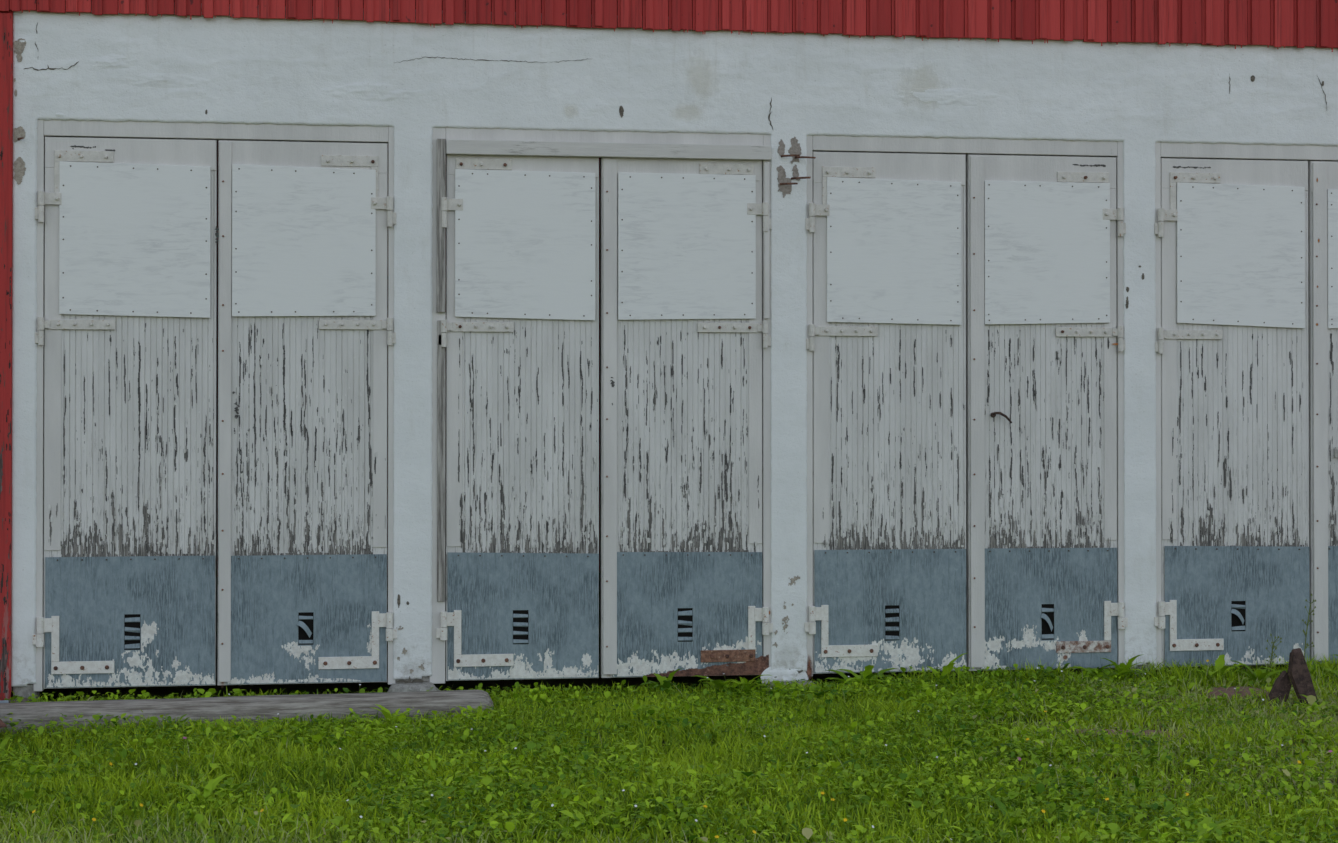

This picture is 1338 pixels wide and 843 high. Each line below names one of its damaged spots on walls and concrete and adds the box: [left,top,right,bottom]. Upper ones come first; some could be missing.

flaking render [0,126,26,185]
peeling [48,323,214,557]
peeling [232,323,378,556]
peeling [458,325,759,554]
peeling [823,330,965,550]
peeling [985,330,1111,548]
peeling [1169,334,1307,547]
peeling [1329,333,1338,546]
peeling [0,518,11,693]
peeling [47,620,360,687]
corrosion [645,655,769,677]
peeling [815,624,1088,673]